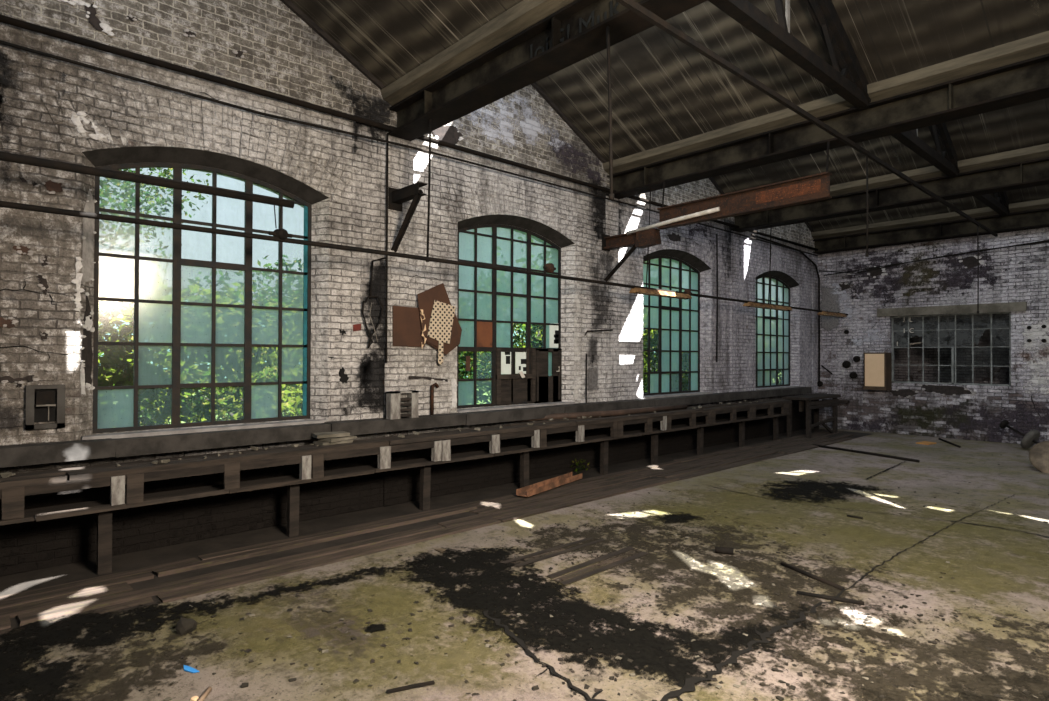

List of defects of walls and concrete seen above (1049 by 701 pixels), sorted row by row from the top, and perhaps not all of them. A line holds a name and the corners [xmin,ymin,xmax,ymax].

corrosion [756,179,821,204]
peeling [839,246,914,307]
peeling [927,241,1011,299]
crack [660,486,1048,701]
crack [483,610,607,701]